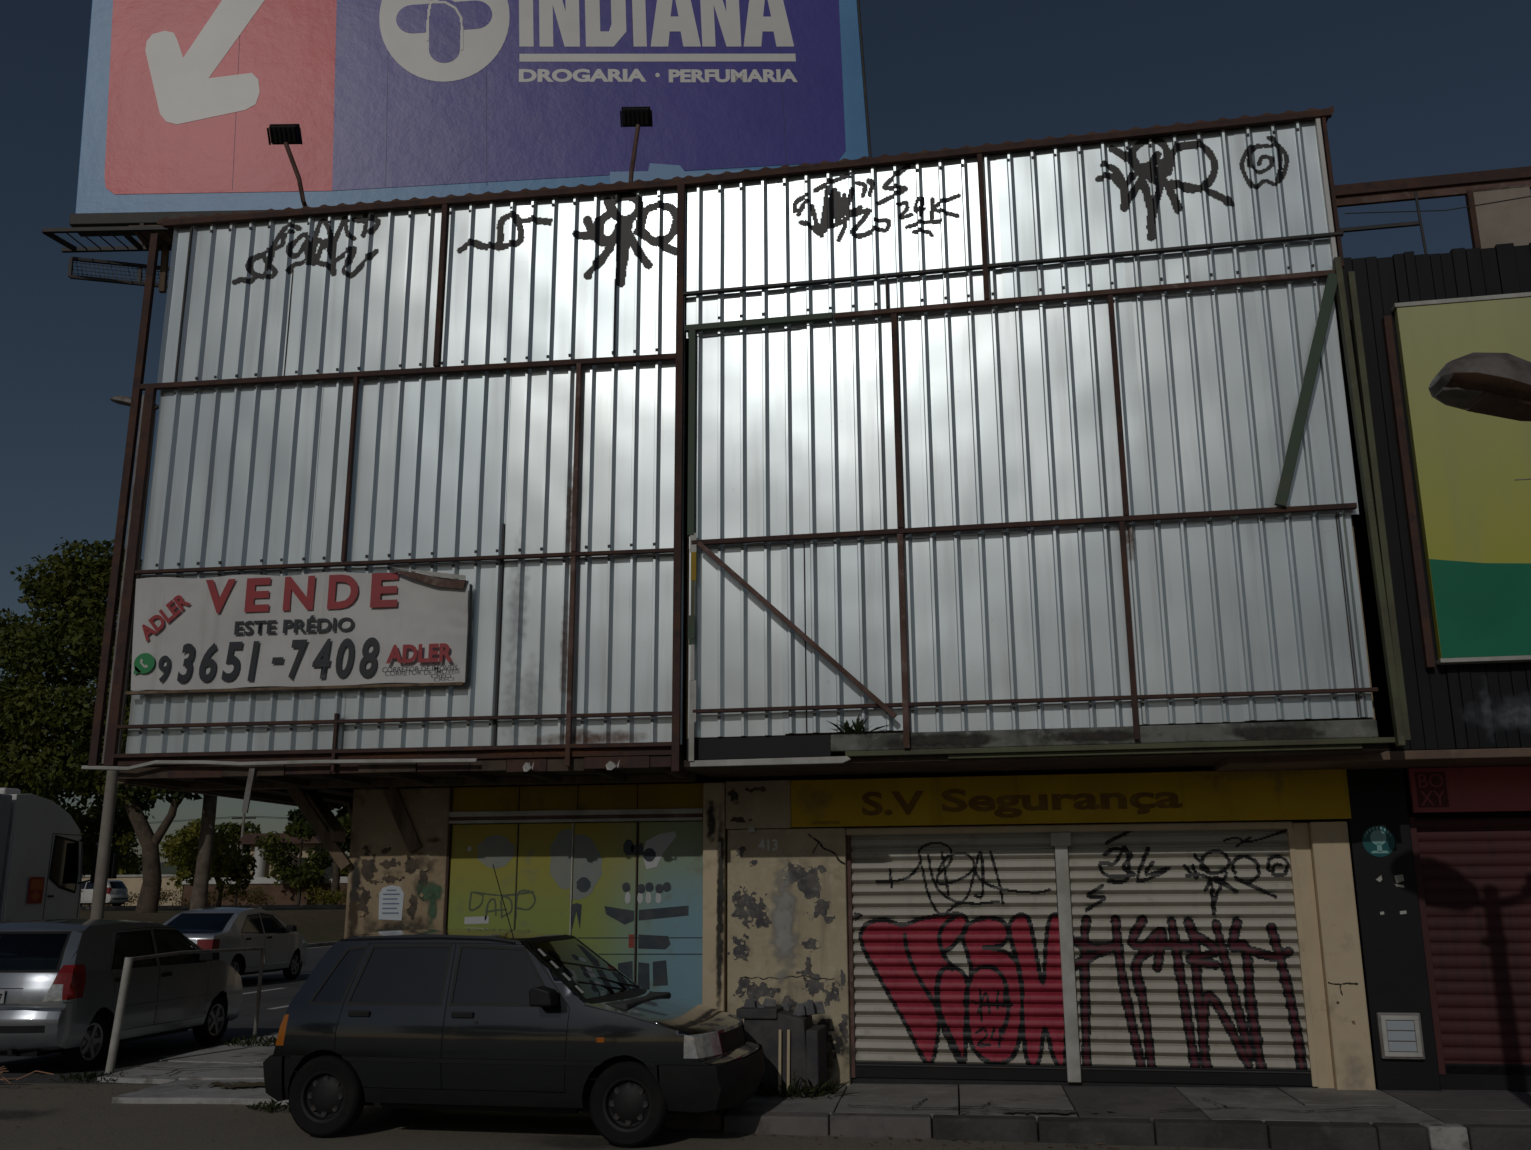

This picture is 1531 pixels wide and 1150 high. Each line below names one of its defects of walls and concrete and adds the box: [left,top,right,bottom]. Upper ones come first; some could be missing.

peeling [357,845,429,920]
peeling [727,862,849,1059]